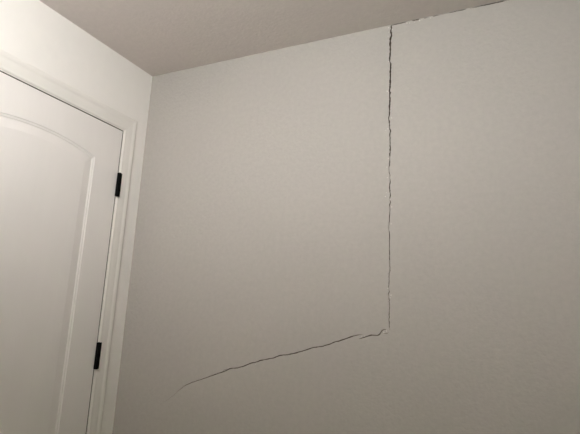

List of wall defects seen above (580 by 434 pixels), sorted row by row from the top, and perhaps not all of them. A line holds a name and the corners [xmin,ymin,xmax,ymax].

crack [166,0,507,401]